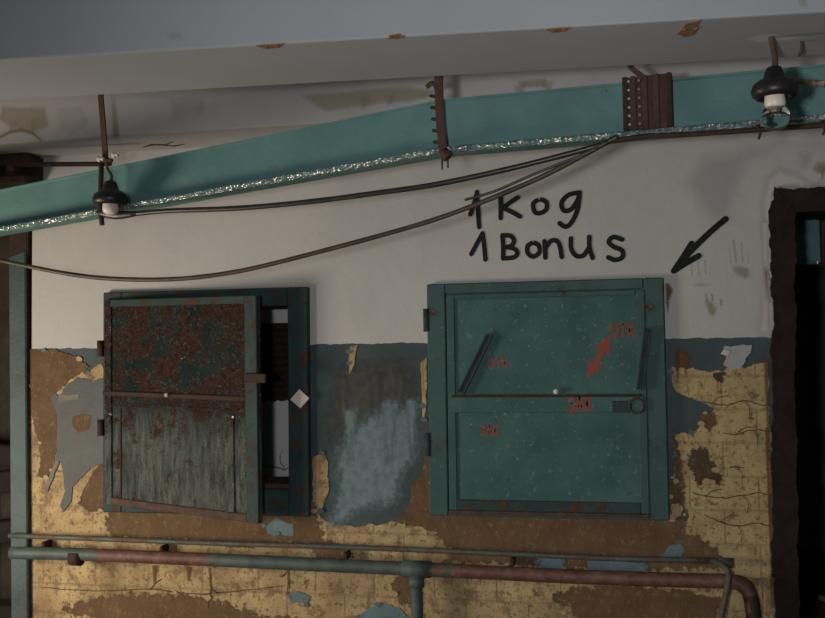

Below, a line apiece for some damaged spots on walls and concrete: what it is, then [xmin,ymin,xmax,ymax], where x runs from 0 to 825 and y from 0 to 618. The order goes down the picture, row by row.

crack [700,396,774,446]
peeling [29,345,775,618]
crack [692,466,770,545]